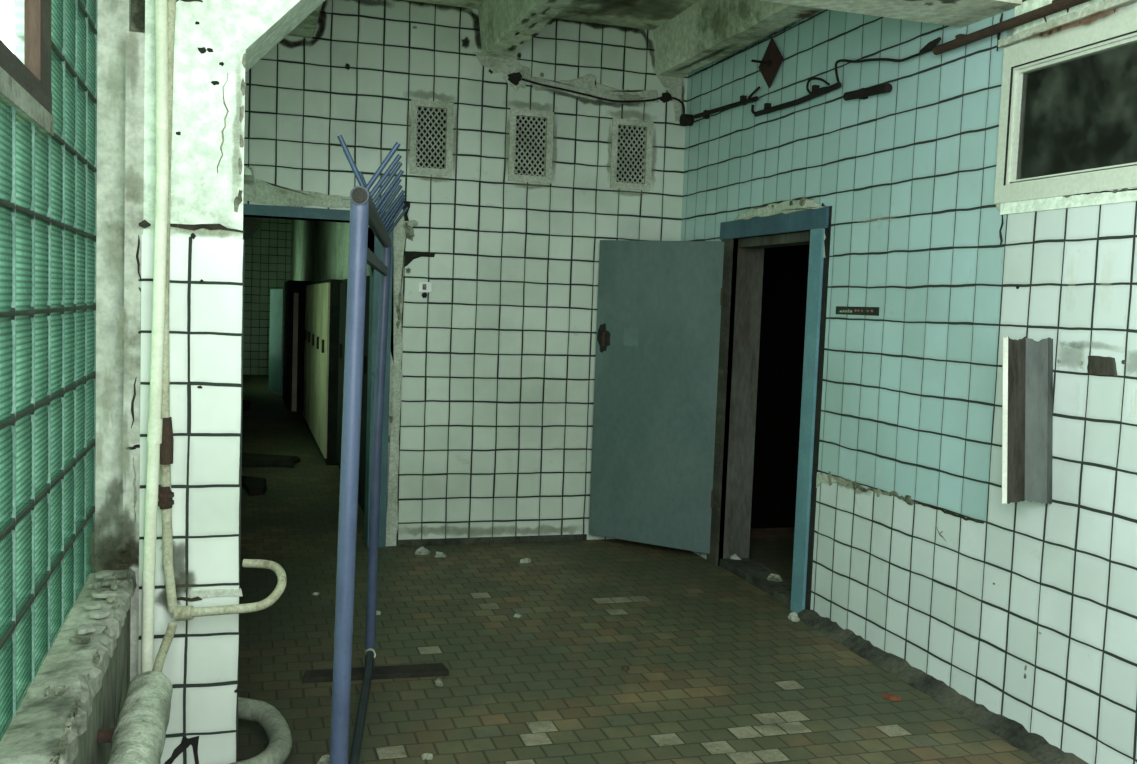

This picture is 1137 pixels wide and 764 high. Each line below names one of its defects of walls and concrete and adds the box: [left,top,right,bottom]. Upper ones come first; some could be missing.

leakage [279,0,327,48]
leakage [354,0,481,48]
spalling [816,471,984,524]
peeling [69,570,128,681]
spalling [45,685,81,764]